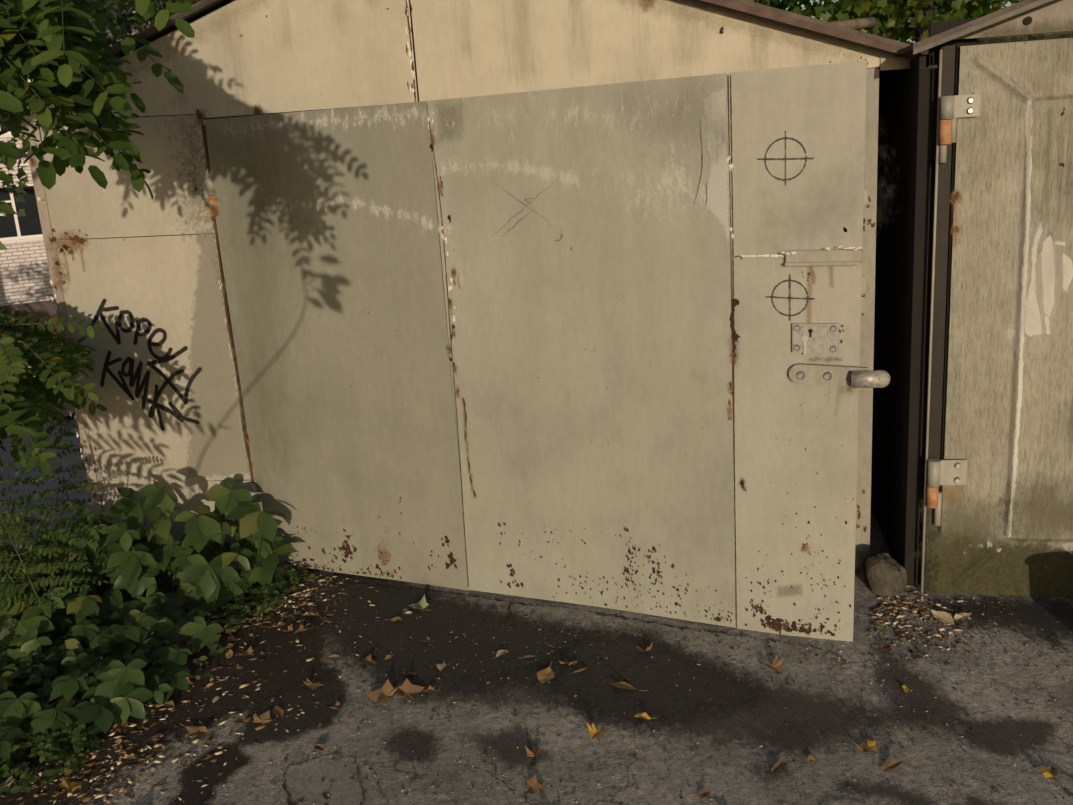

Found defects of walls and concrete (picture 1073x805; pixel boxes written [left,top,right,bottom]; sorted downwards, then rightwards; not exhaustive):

rust [49,229,88,286]
rust [427,106,476,586]
rust [727,75,735,299]
rust [727,353,747,626]
crack [0,573,823,805]